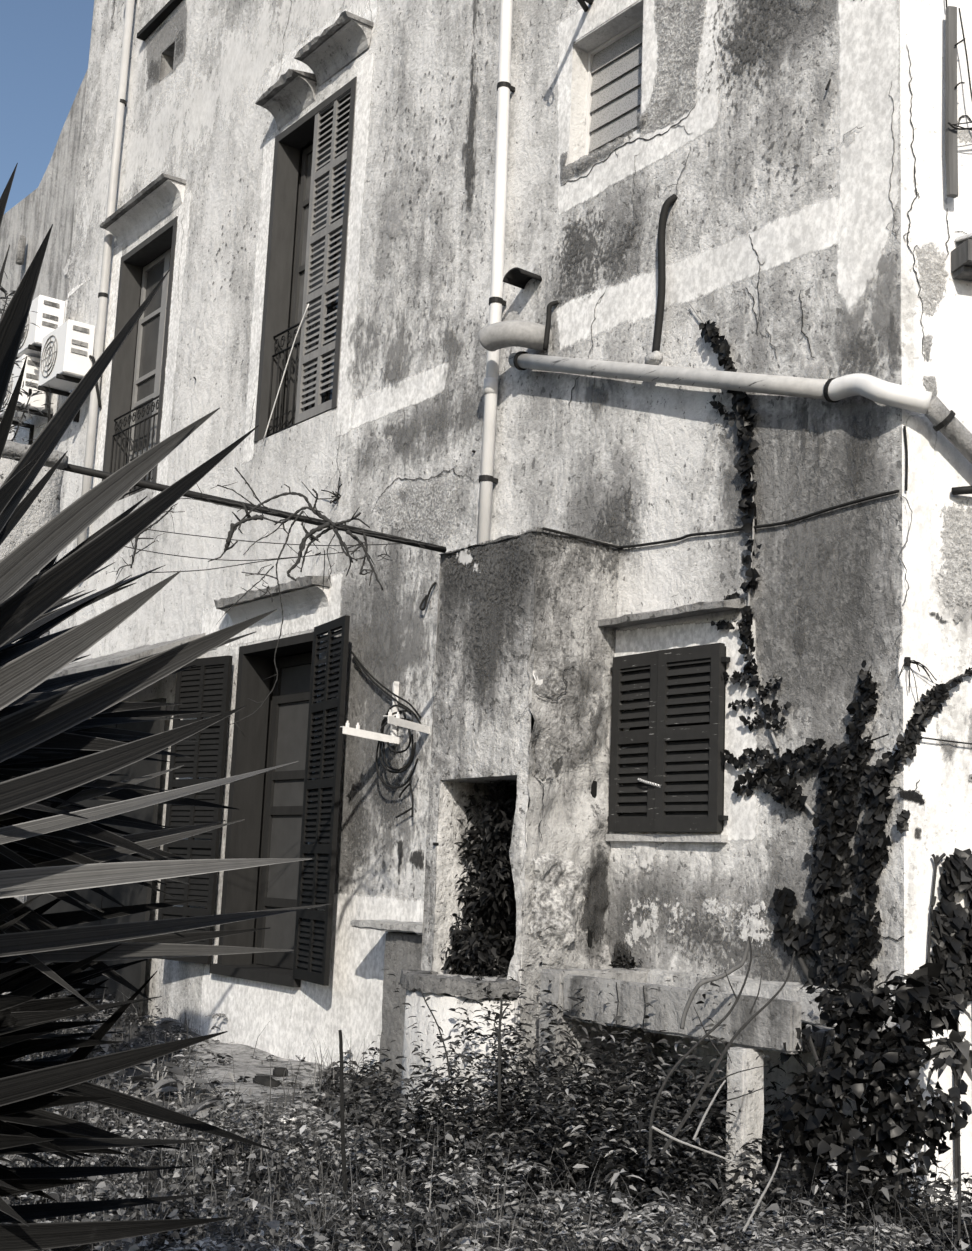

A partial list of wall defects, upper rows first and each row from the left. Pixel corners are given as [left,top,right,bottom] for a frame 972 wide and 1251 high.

damp [462,0,479,210]
damp [700,0,814,112]
crack [745,235,815,359]
crack [840,45,967,357]
damp [339,479,640,884]
peeling [624,897,773,951]